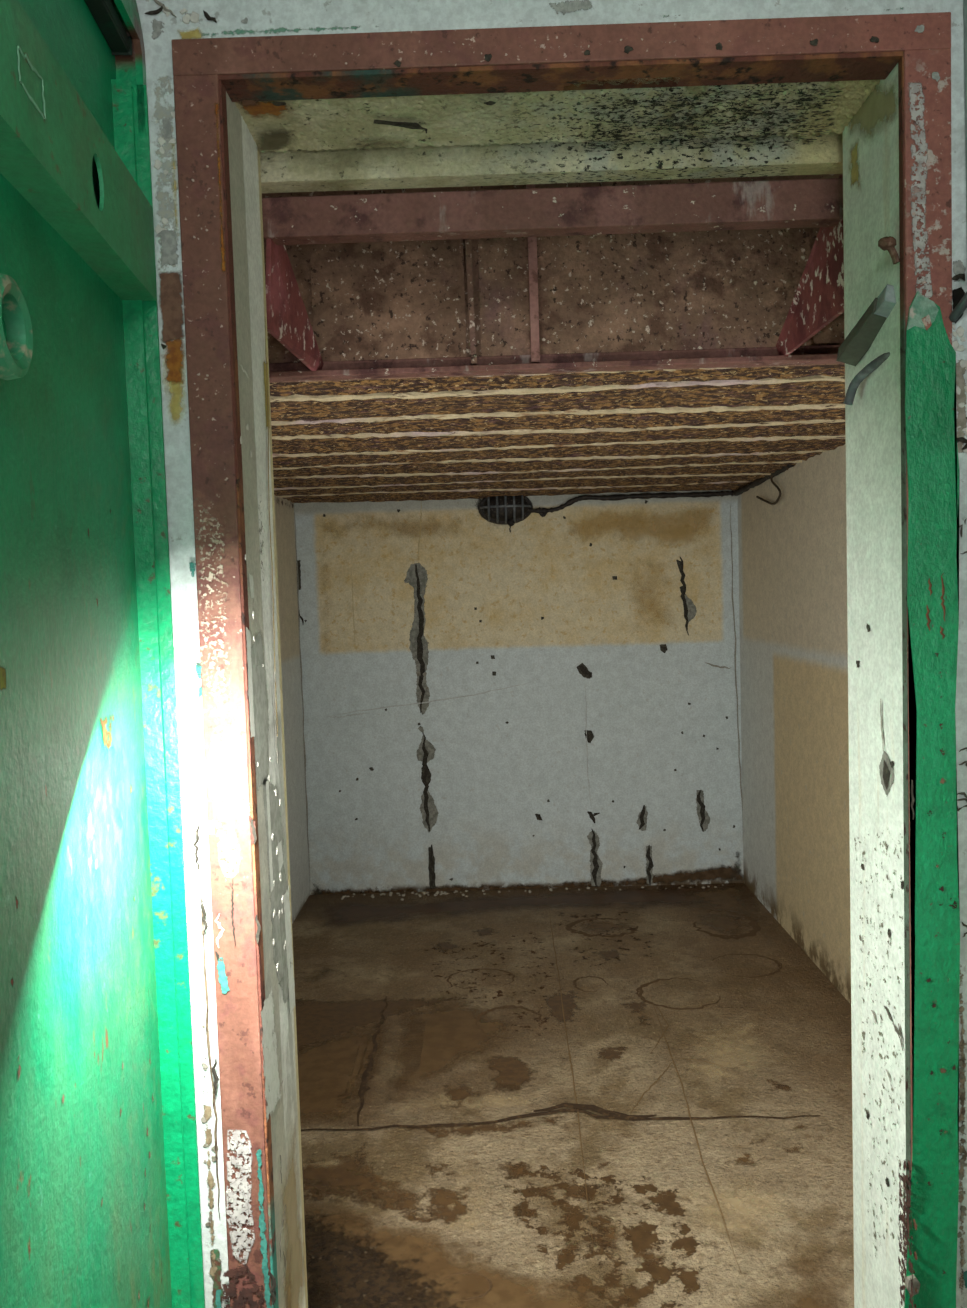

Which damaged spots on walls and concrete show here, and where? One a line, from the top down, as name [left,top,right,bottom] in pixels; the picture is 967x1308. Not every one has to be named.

peeling [189,503,230,717]
corrosion [100,715,114,751]
corrosion [249,816,257,845]
peeling [245,501,296,1122]
spalling [636,805,648,831]
corrosion [211,1058,219,1095]
peeling [183,799,255,1308]
crack [359,1058,374,1100]
corrosion [215,1149,303,1308]
water stain [302,1143,707,1308]